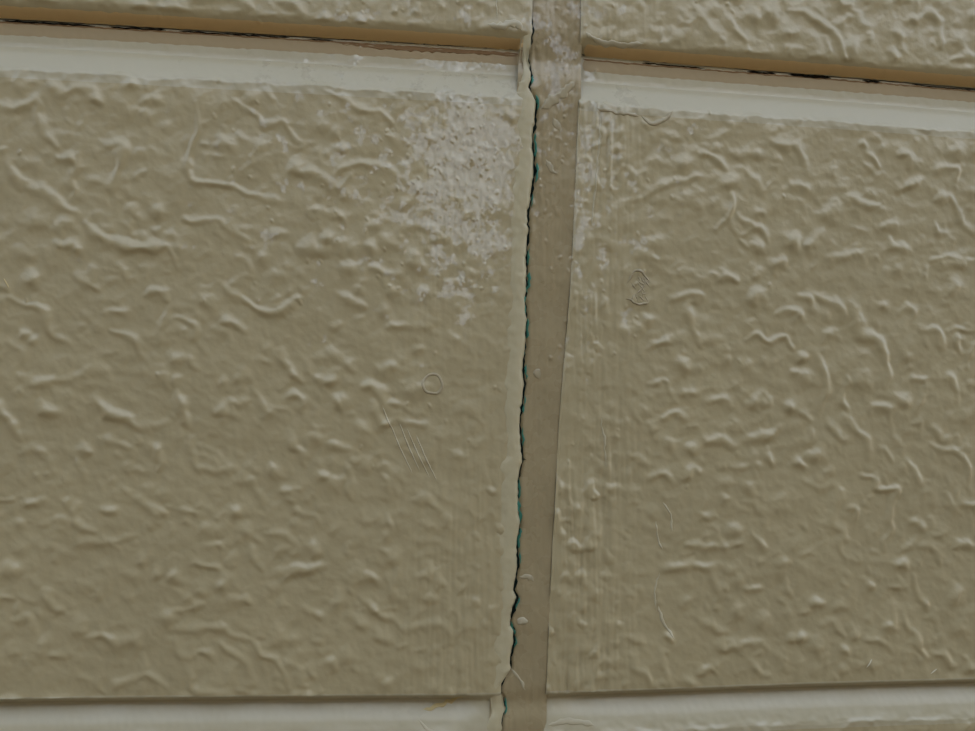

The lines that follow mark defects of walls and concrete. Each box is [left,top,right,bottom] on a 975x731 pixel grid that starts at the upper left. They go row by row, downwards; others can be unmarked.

crack [501,19,537,726]